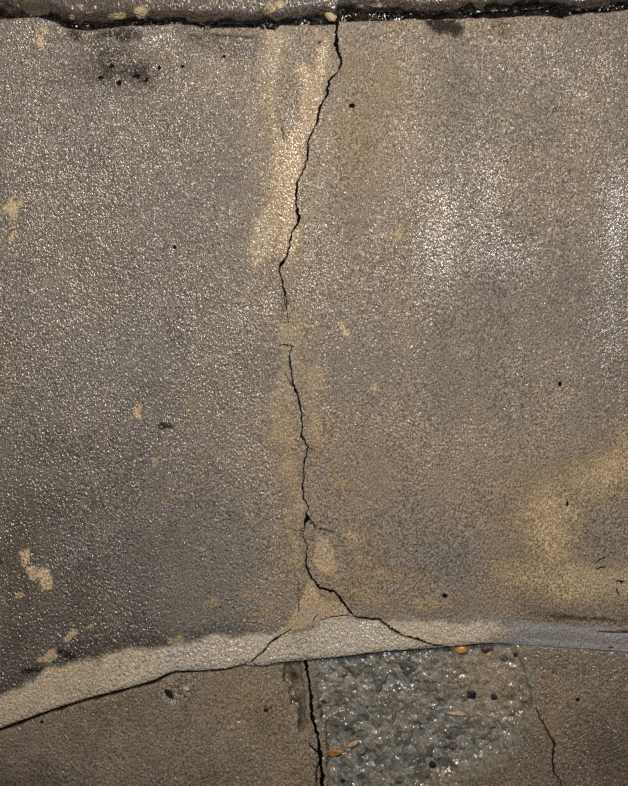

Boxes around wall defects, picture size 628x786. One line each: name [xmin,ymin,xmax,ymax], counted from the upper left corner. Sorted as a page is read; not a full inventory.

crack [274,22,347,323]
crack [279,344,454,648]
crack [246,627,292,665]
crack [300,660,330,786]
spalling [275,643,540,786]
crack [532,707,571,786]